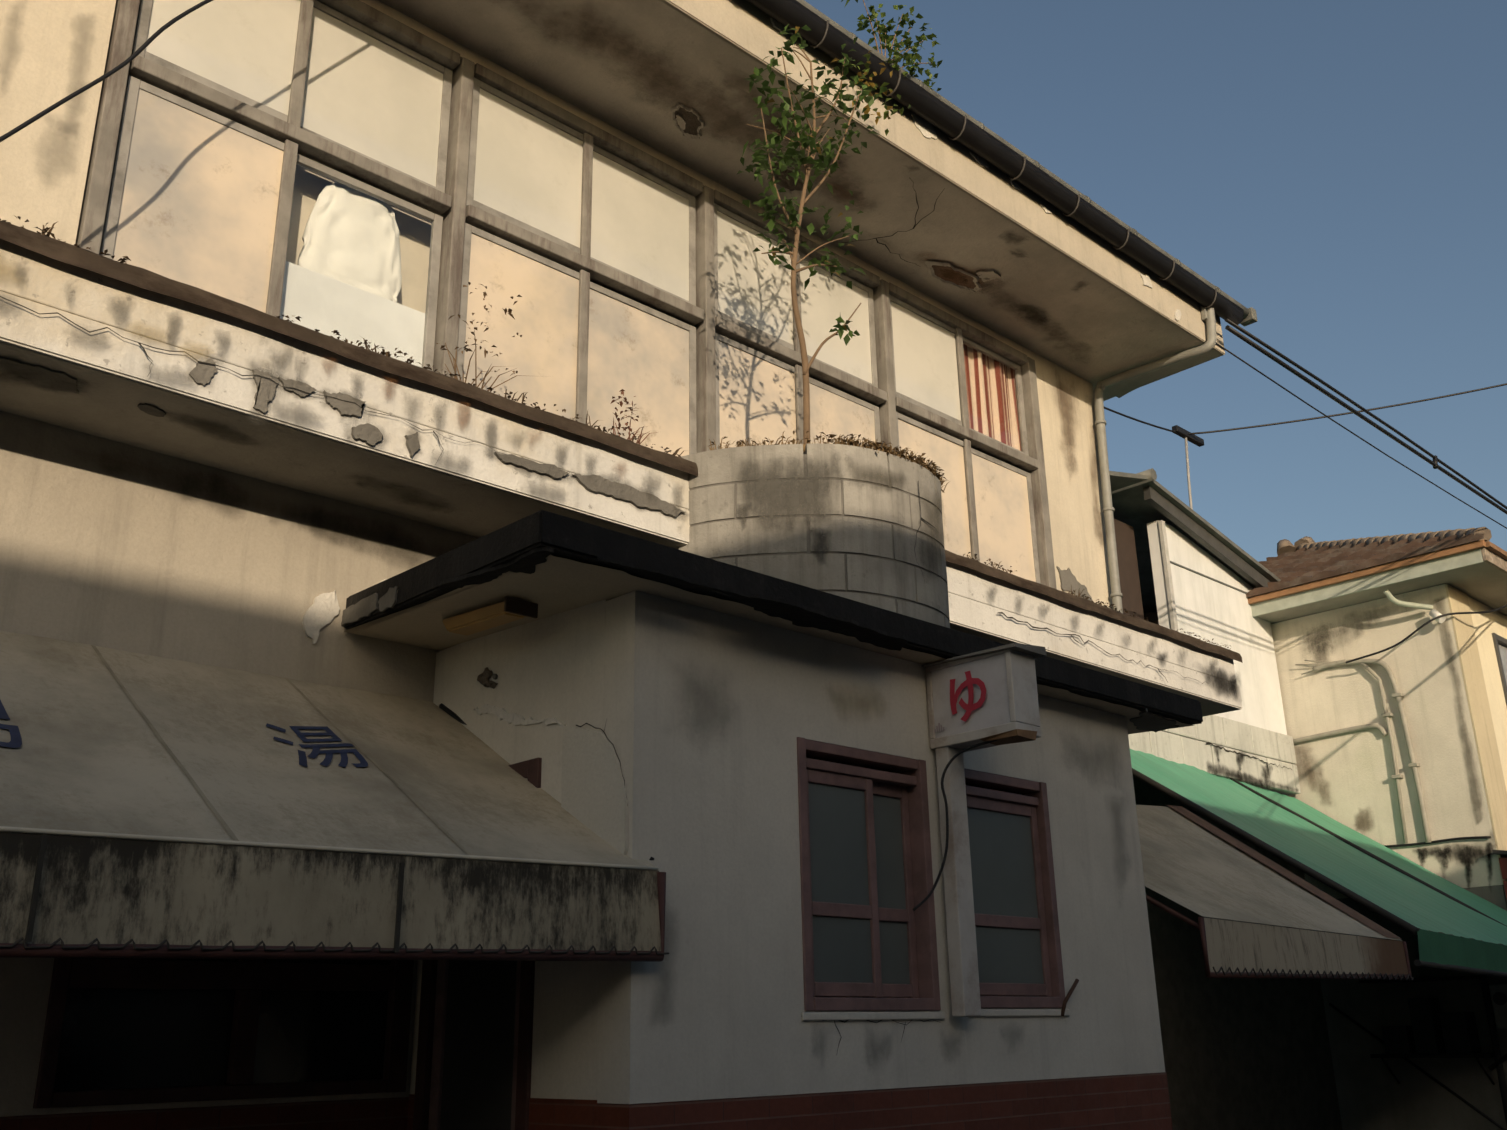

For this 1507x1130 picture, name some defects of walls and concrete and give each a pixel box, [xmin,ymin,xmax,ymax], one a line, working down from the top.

spalling [670,102,706,139]
peeling [189,358,218,386]
peeling [252,369,383,446]
peeling [405,432,420,458]
leakage [738,463,839,561]
peeling [302,579,399,644]
crack [576,720,628,805]
leakage [1462,729,1480,811]
leakage [1418,843,1492,883]